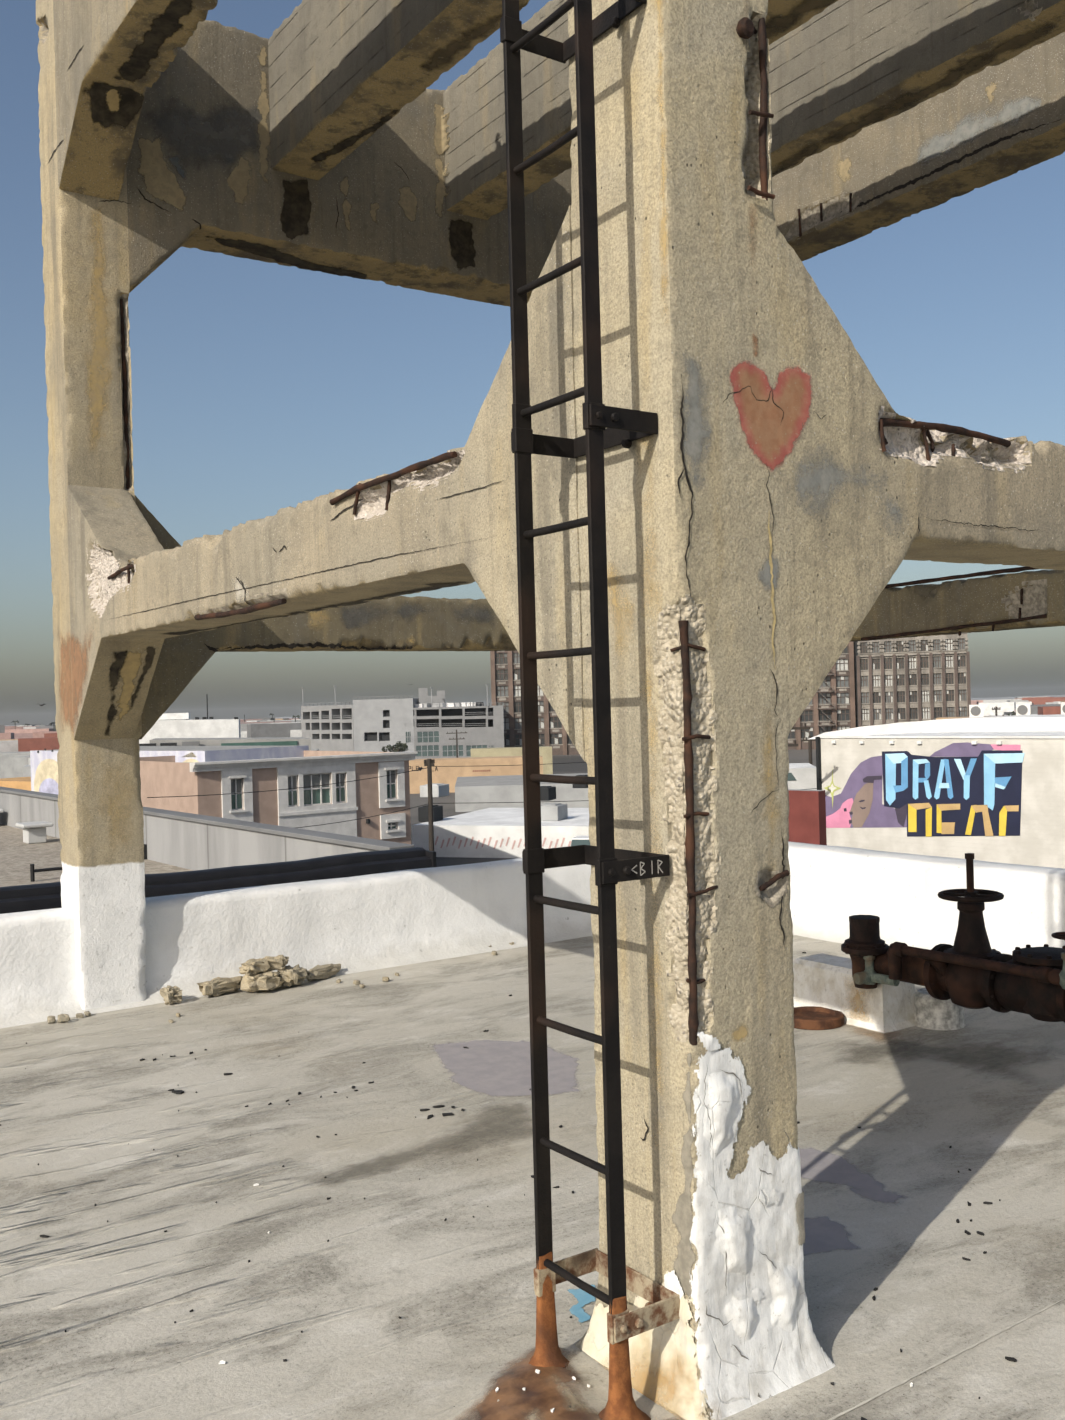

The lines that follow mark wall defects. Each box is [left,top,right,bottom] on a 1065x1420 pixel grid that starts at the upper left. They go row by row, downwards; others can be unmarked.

spalling [742,10,775,201]
crack [723,386,827,422]
spalling [878,406,1034,473]
spalling [329,449,465,522]
crack [677,374,694,611]
crack [766,464,774,539]
crack [752,669,780,811]
crack [778,832,786,947]
peeling [627,594,835,1420]
peeling [580,1302,609,1369]
corrosion [467,1347,603,1420]
corrosion [631,1365,675,1410]